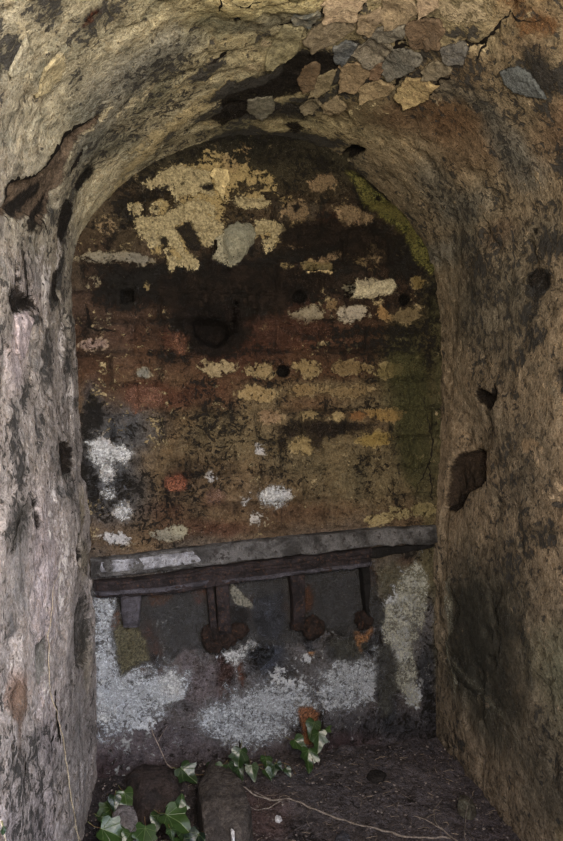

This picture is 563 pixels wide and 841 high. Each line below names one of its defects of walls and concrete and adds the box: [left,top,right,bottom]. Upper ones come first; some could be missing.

crack [465,10,540,63]
flaking render [0,114,99,235]
flaking render [311,173,337,193]
flaking render [127,163,309,272]
flaking render [340,203,374,225]
flaking render [352,278,396,298]
leakage [87,441,132,498]
flaking render [447,449,487,512]
leakage [93,598,190,741]
leakage [199,562,429,749]
rust [355,629,372,647]
crack [52,690,61,743]